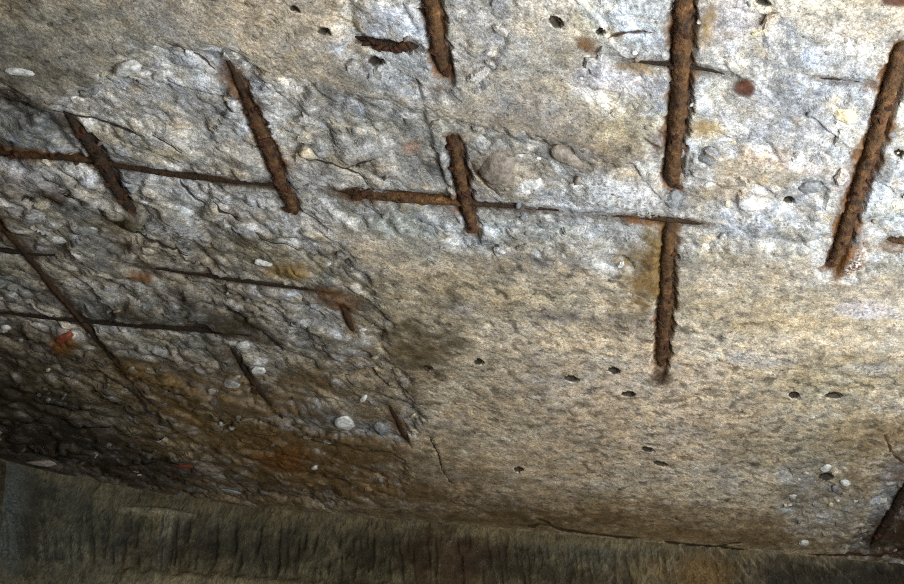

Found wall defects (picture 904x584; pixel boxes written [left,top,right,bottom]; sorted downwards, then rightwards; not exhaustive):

corrosion [60,113,278,231]
corrosion [427,0,454,79]
corrosion [444,134,531,236]
corrosion [654,7,674,72]
corrosion [660,87,684,192]
corrosion [689,2,715,82]
corrosion [735,81,755,96]
corrosion [819,39,904,279]
corrosion [0,219,121,360]
corrosion [174,265,359,333]
spalling [0,46,826,506]
corrosion [615,214,704,385]